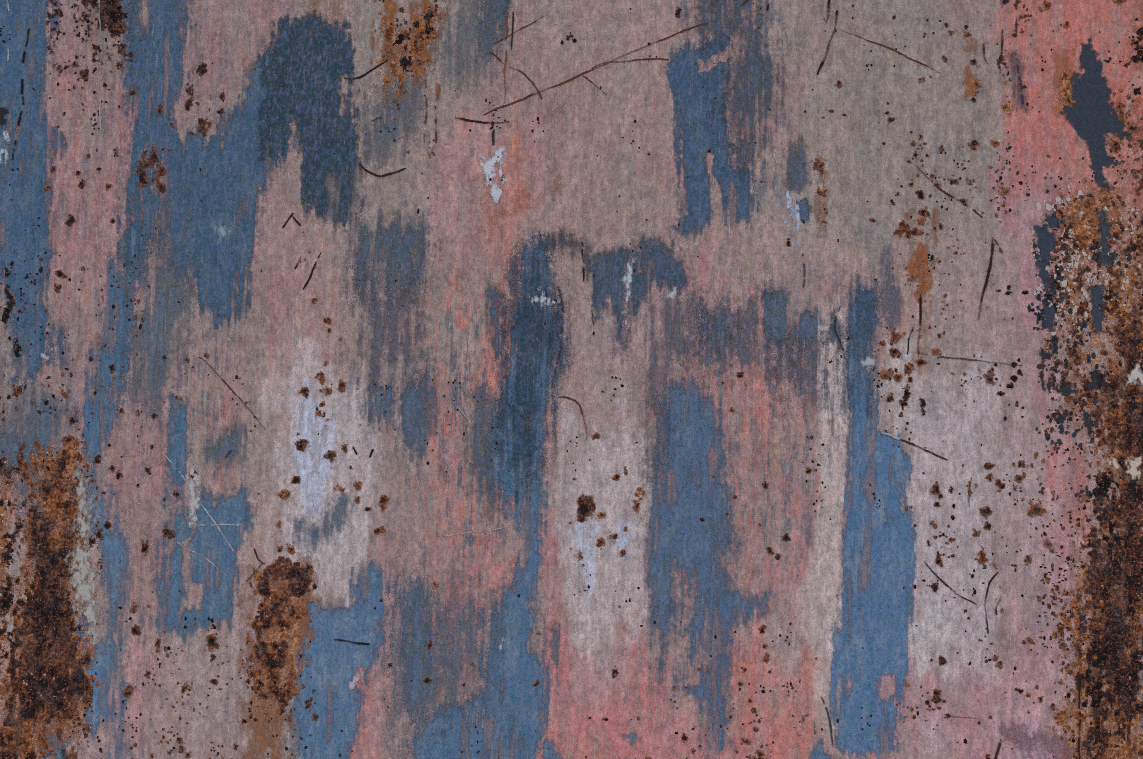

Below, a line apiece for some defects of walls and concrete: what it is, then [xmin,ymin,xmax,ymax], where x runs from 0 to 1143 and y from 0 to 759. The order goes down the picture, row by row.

corrosion [46,0,133,89]
corrosion [371,0,448,138]
corrosion [891,135,1010,302]
corrosion [0,251,69,323]
corrosion [951,354,1024,409]
corrosion [967,88,1143,759]
corrosion [923,472,953,507]
corrosion [0,358,122,759]
corrosion [927,520,959,592]
corrosion [150,630,208,758]
corrosion [204,542,318,759]
corrosion [896,688,950,730]